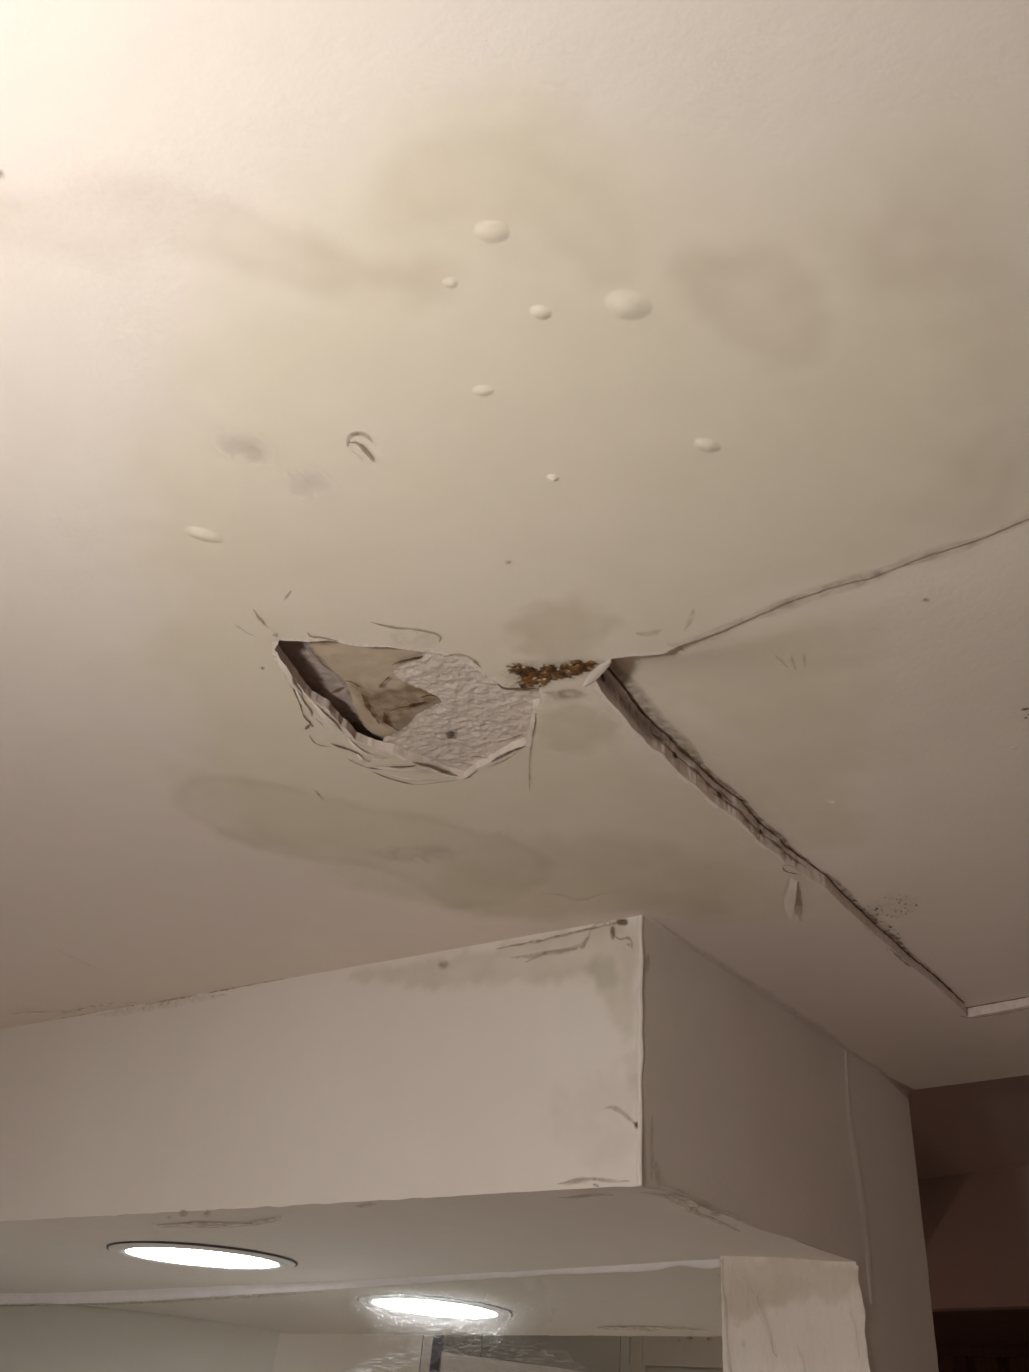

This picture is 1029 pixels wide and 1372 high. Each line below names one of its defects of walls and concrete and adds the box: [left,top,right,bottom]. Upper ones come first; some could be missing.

spalling [275,633,541,785]
corrosion [498,660,596,690]
crack [583,660,1029,1018]
crack [498,920,625,949]